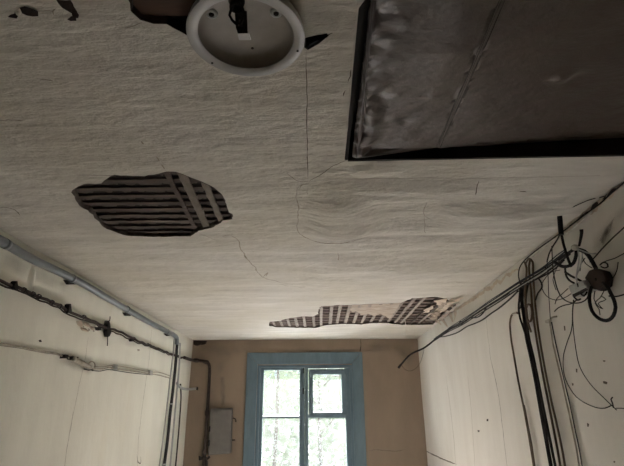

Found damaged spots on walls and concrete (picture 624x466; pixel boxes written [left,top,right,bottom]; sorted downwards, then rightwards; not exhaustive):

spalling [8,0,79,21]
spalling [129,0,196,35]
crack [288,51,359,260]
spalling [71,171,233,237]
spalling [269,297,477,328]